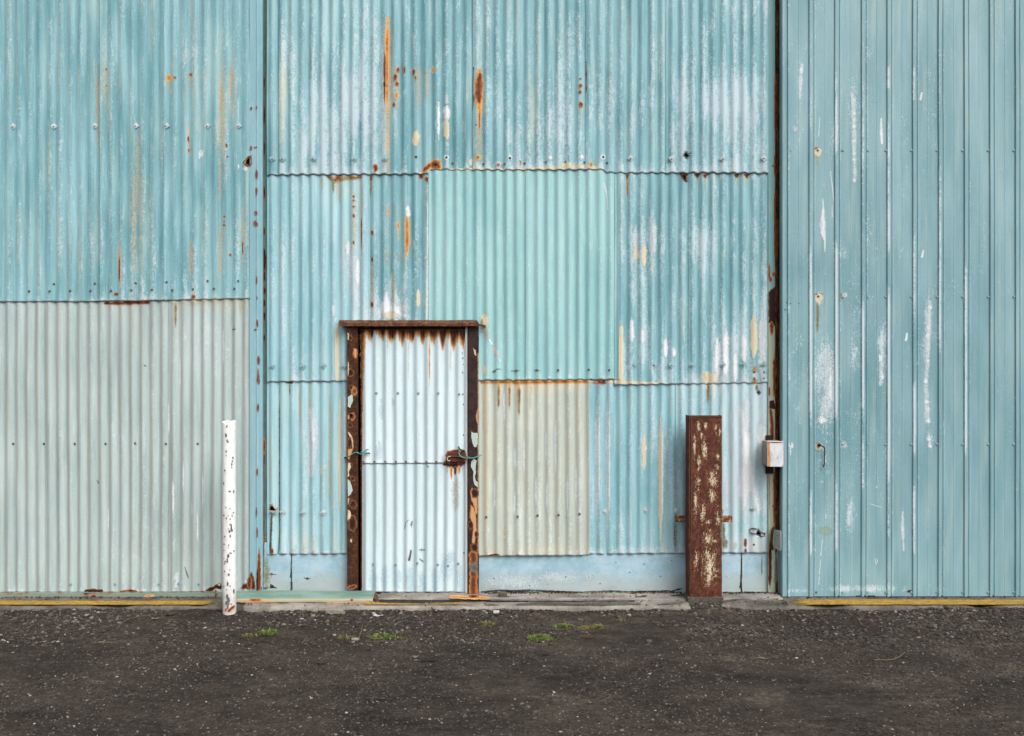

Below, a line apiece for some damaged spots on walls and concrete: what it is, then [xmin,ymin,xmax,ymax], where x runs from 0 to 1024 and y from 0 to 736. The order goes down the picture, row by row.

rust [472,67,485,160]
rust [321,17,468,512]
rust [689,416,722,590]